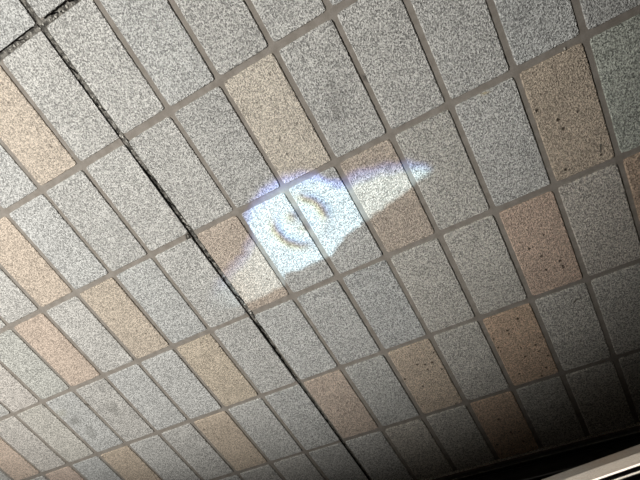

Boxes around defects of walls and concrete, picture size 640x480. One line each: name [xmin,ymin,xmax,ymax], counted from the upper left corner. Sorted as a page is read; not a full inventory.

crack [0,0,370,480]